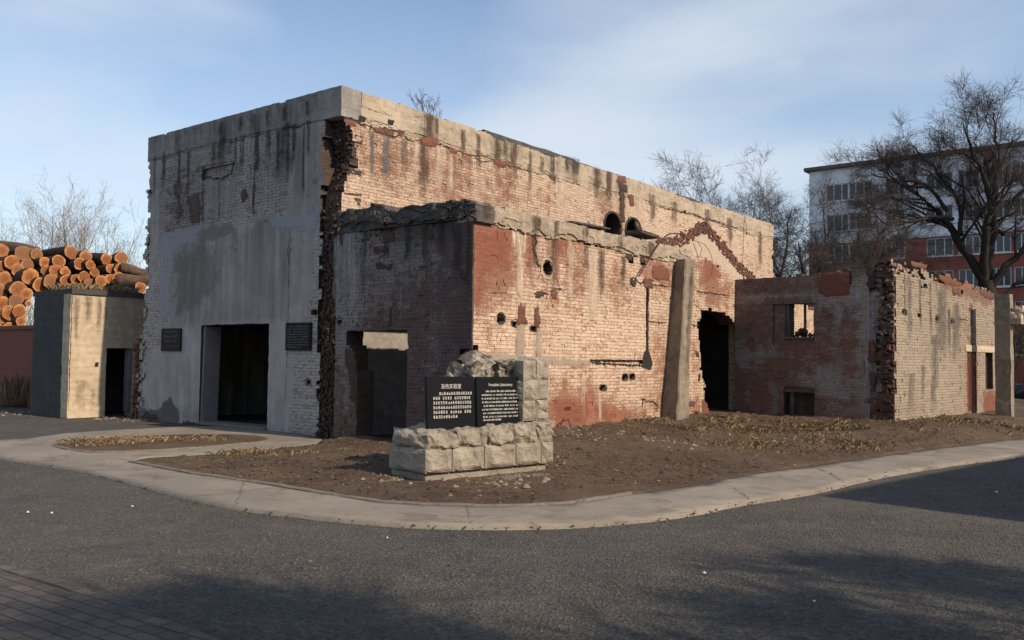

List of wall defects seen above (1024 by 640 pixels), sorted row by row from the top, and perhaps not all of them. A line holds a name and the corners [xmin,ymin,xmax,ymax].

leakage [218,101,320,211]
crack [151,107,591,191]
leakage [371,134,390,174]
leakage [402,114,480,187]
leakage [496,138,623,202]
spalling [138,397,199,426]